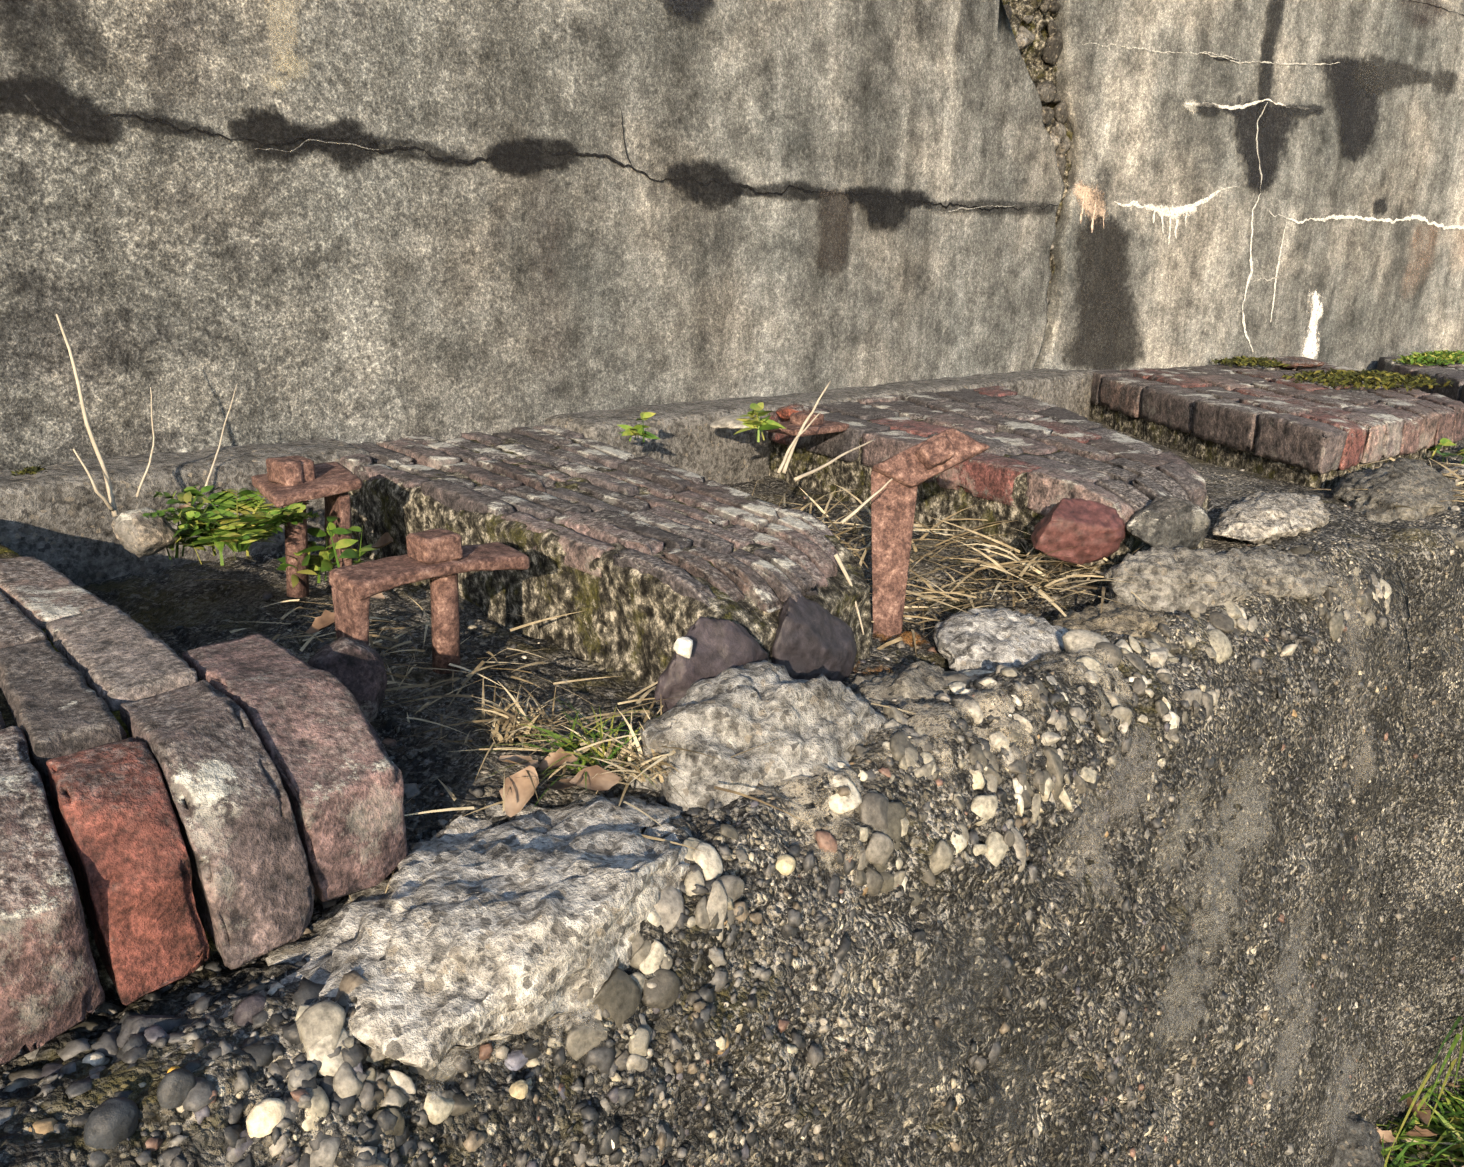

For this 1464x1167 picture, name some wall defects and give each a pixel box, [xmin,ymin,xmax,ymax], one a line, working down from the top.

water stain [663,0,714,23]
water stain [0,0,468,170]
crack [203,108,753,189]
water stain [486,138,578,176]
water stain [666,160,1054,273]
crack [930,0,1340,323]
crack [1114,99,1464,352]
water stain [1196,0,1458,195]
water stain [1373,199,1387,214]
water stain [1063,195,1143,370]
efflorescence [1301,291,1323,359]